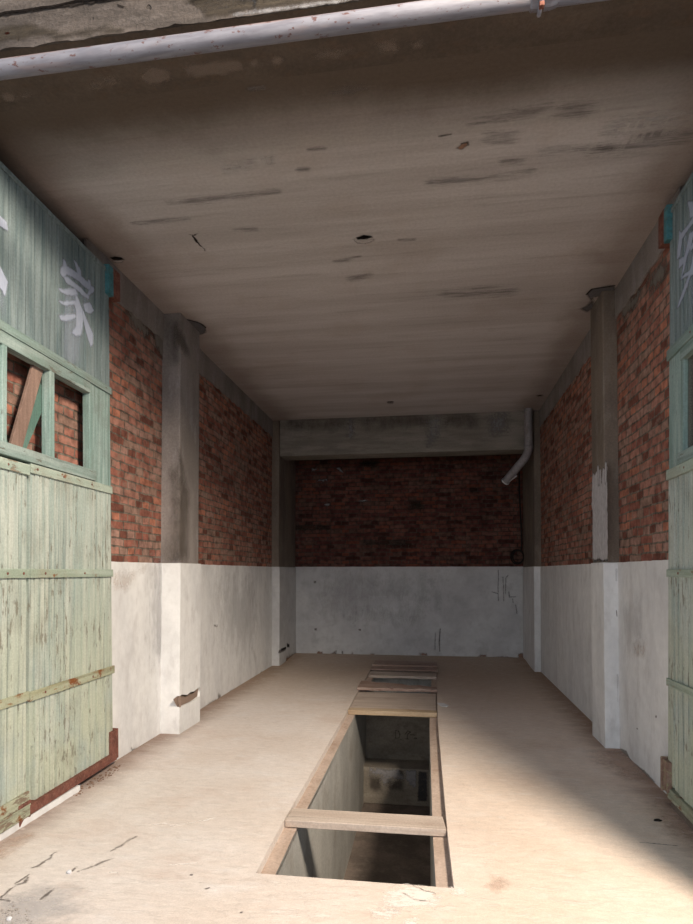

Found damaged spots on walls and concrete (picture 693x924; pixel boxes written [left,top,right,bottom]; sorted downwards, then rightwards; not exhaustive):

crack [0,854,52,902]